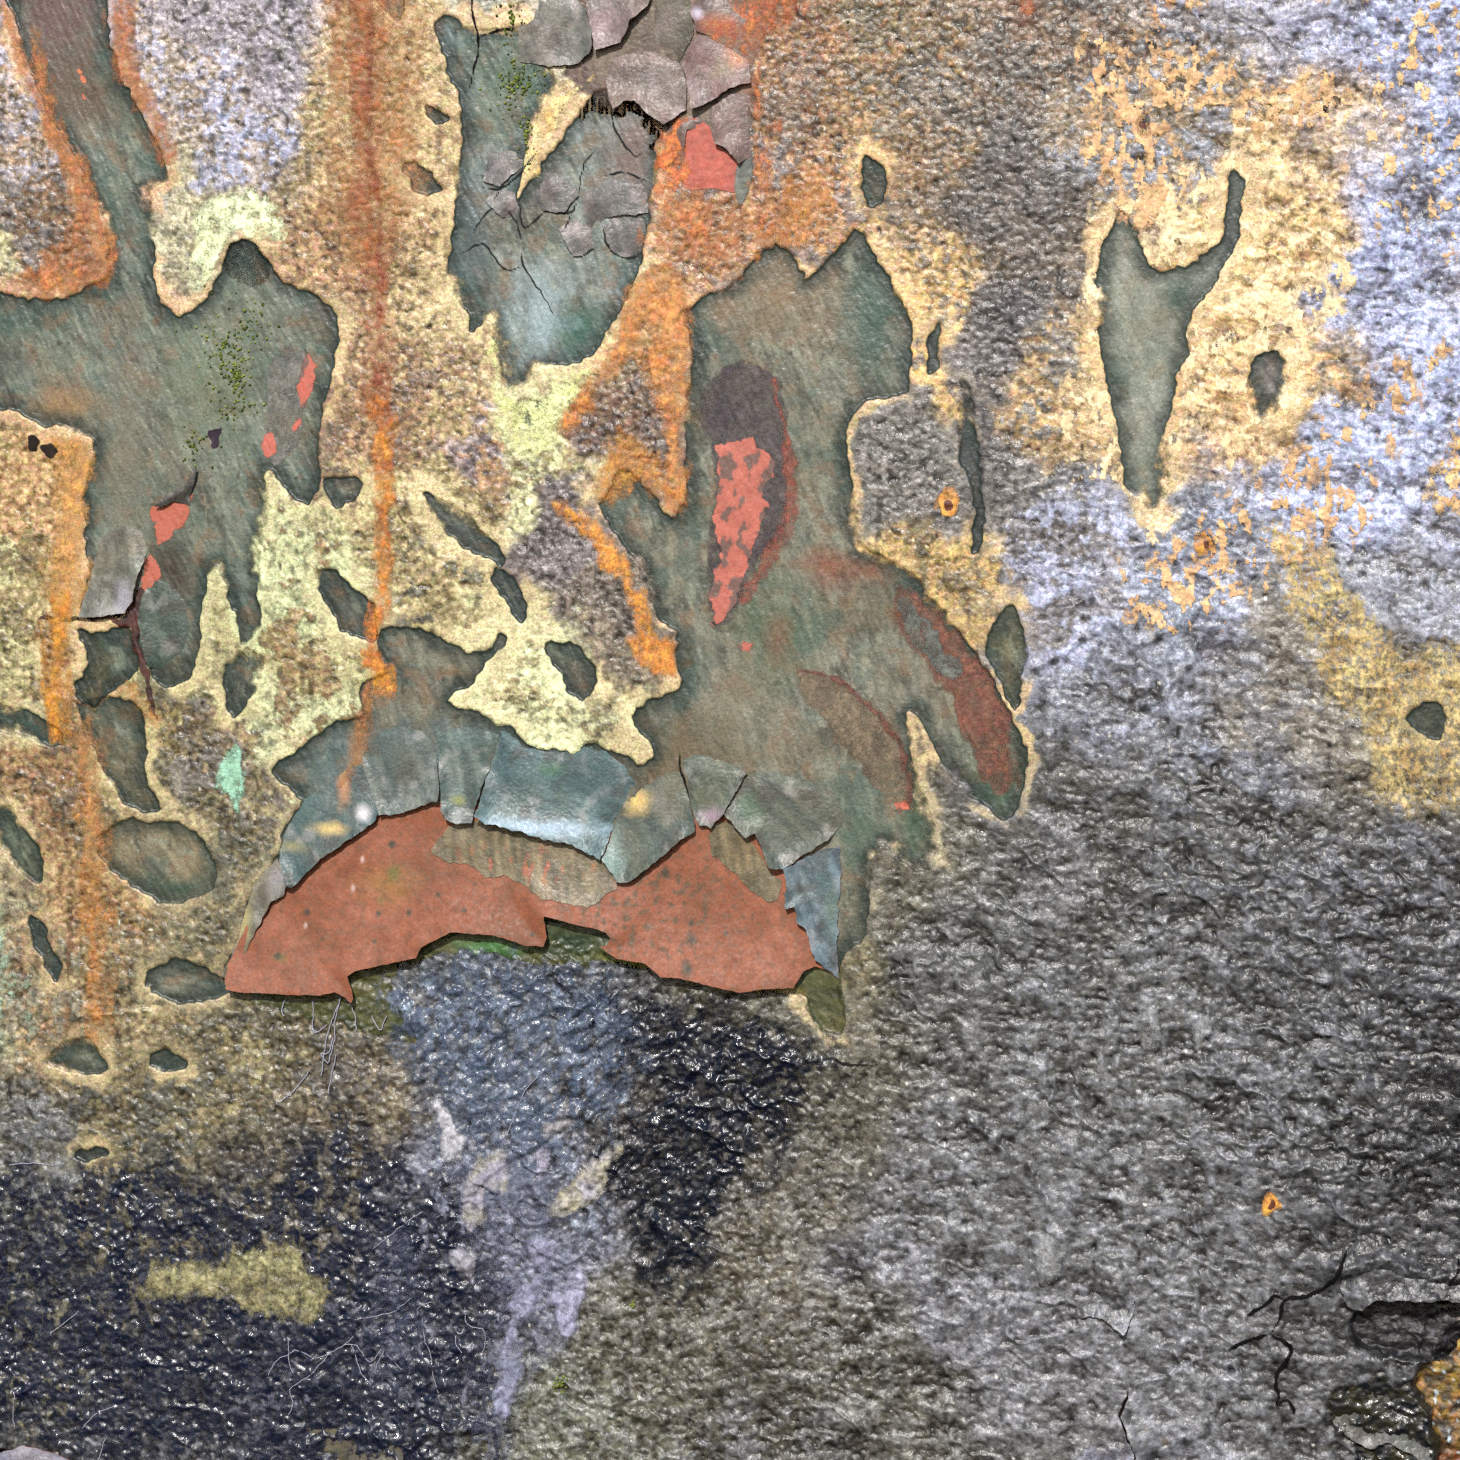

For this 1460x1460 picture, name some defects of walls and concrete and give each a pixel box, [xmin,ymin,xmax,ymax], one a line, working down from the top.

rust [4,2,117,299]
peeling [0,0,363,904]
rust [328,0,419,739]
peeling [145,229,1029,1043]
peeling [402,0,781,386]
rust [553,503,676,676]
rust [561,71,833,513]
peeling [1095,170,1246,508]
damp [0,950,837,1460]
crack [1118,1391,1135,1460]
crack [1227,1239,1355,1414]
crack [1448,1256,1460,1286]